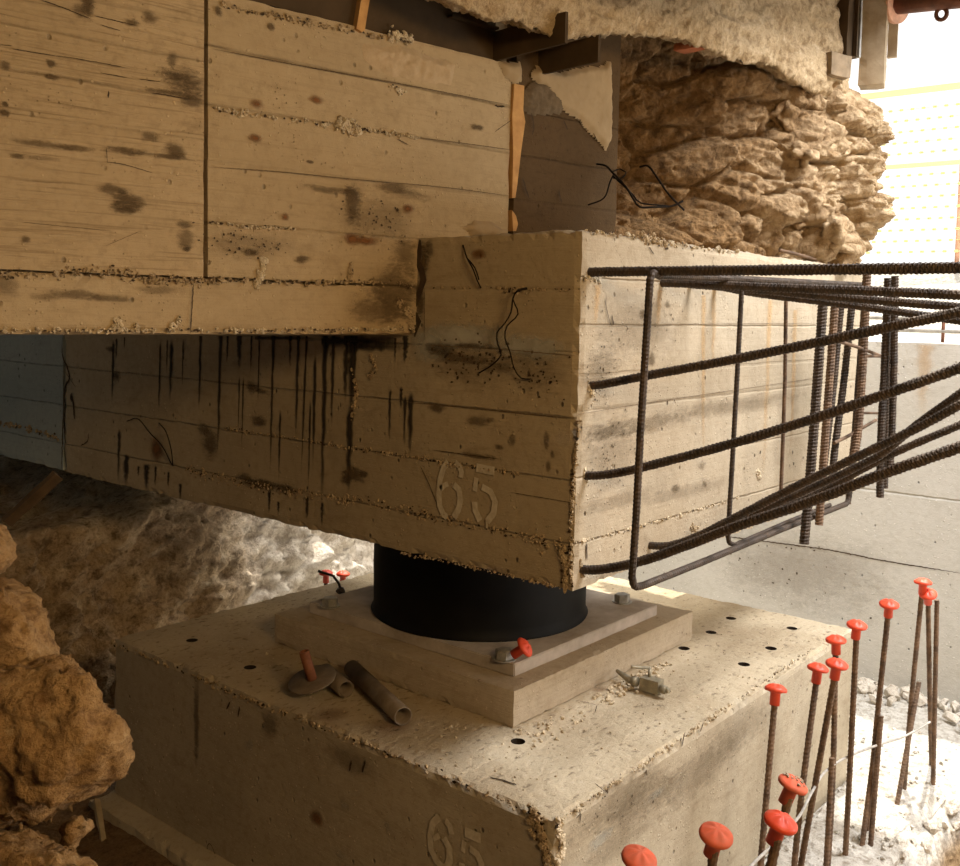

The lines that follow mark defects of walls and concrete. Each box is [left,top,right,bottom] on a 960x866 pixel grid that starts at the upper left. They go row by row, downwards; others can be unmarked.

water stain [150,72,201,106]
water stain [102,185,142,212]
water stain [158,341,184,400]
water stain [205,325,558,483]
spalling [400,229,960,594]
water stain [118,431,182,497]
water stain [240,475,293,512]
spalling [440,598,899,866]